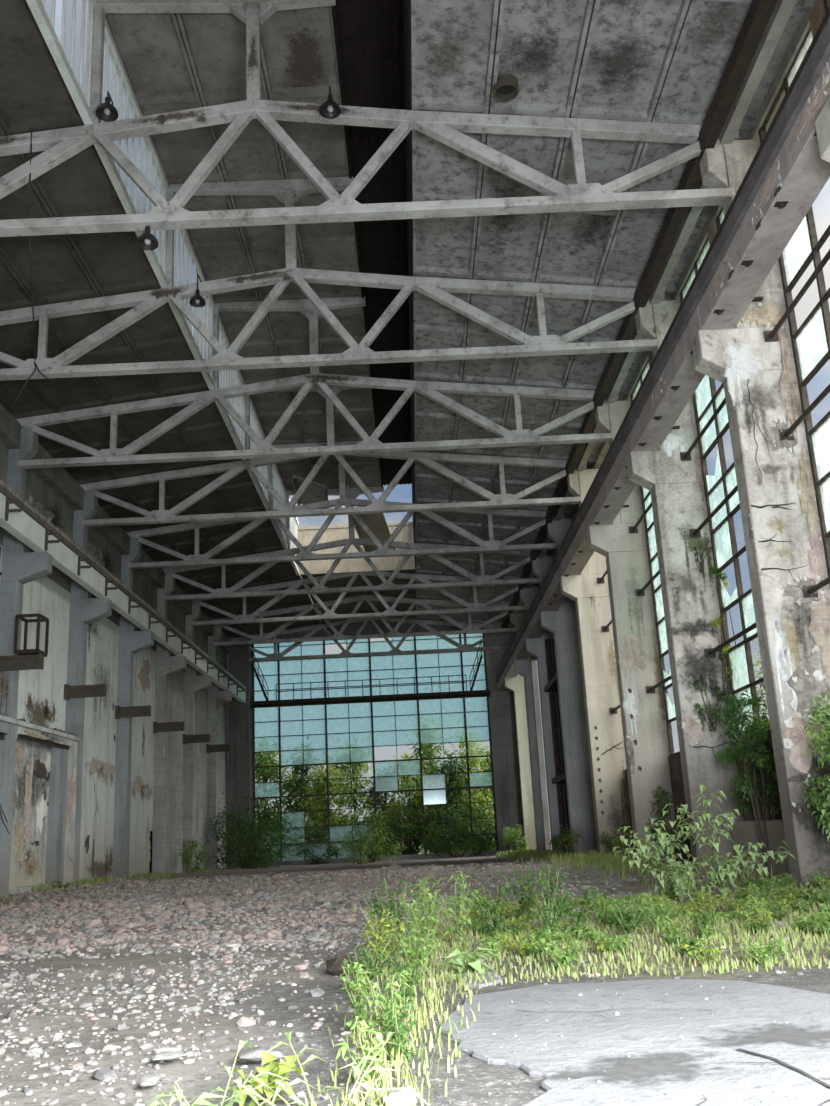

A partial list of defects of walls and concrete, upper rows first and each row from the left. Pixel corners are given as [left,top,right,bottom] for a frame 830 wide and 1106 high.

leakage [725,341,774,433]
spalling [740,301,830,782]
leakage [671,539,719,698]
spalling [12,729,51,862]
leakage [545,1025,830,1084]
crack [737,1048,830,1106]